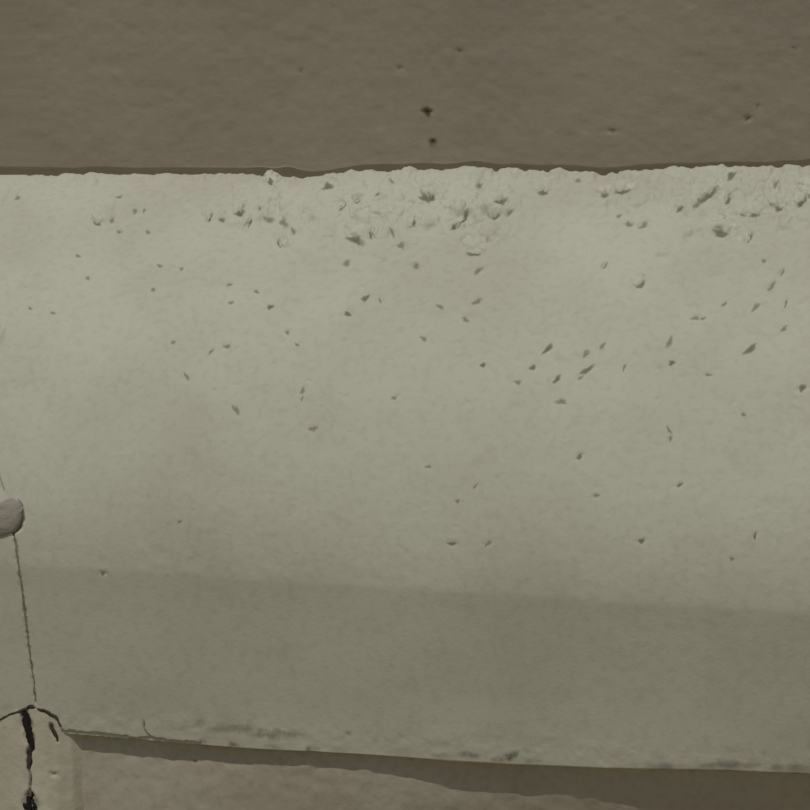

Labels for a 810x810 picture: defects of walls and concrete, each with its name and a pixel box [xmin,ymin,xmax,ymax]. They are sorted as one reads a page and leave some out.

crack [0,532,62,810]